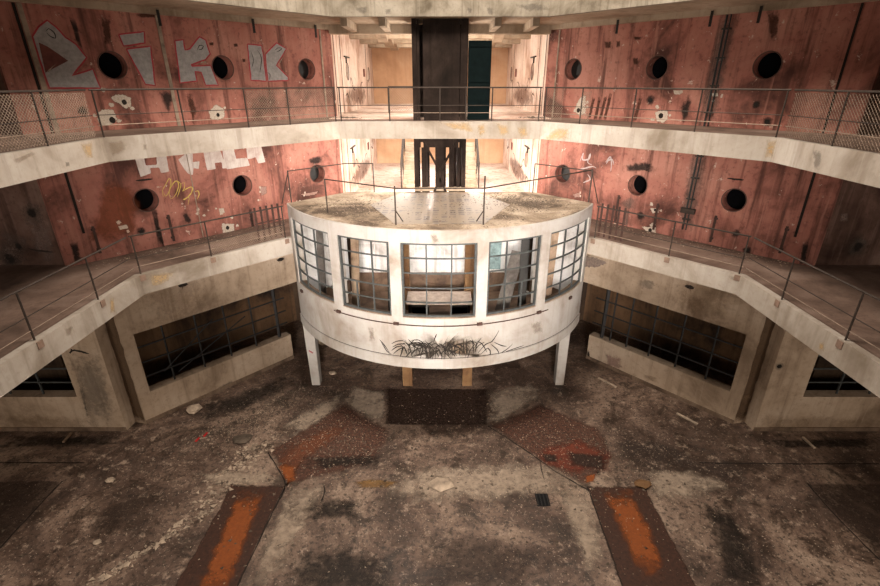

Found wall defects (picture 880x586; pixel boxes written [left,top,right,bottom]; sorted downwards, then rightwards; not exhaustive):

corrosion [176,485,283,586]
corrosion [588,487,695,586]